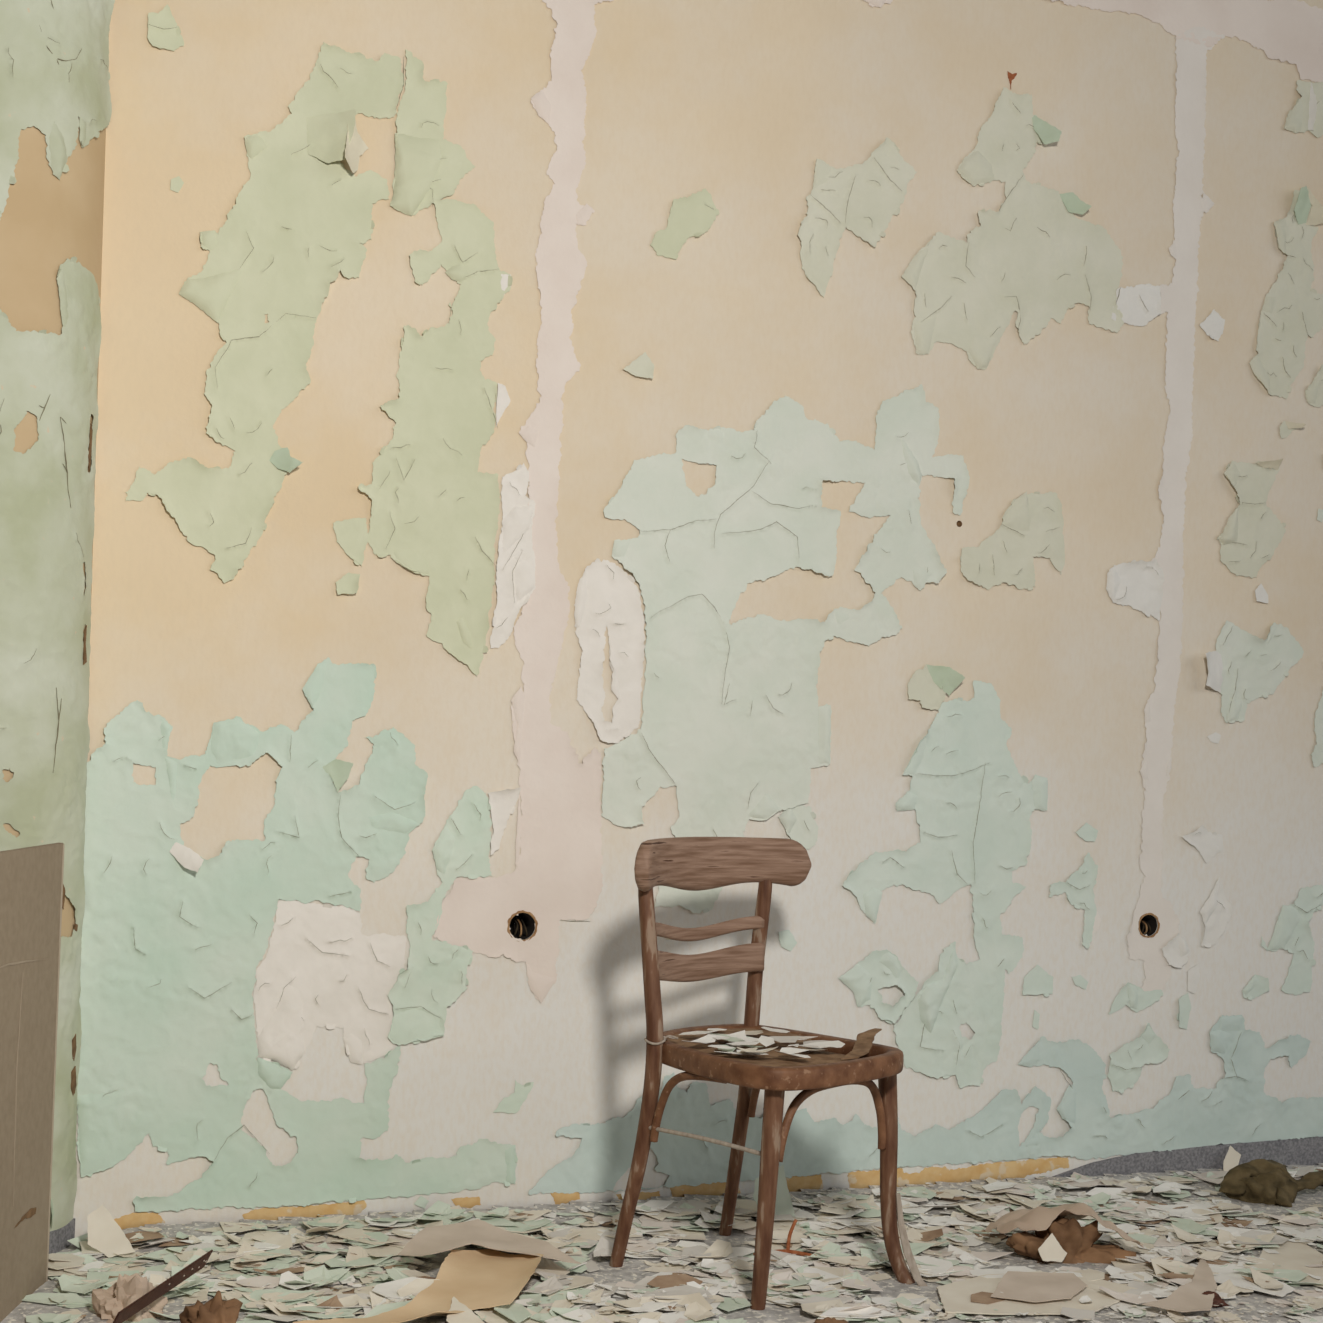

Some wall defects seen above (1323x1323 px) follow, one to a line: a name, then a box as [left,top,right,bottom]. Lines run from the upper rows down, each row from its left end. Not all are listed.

peeling [0,0,115,217]
peeling [650,189,719,259]
peeling [901,87,1162,370]
peeling [126,42,536,676]
peeling [0,257,521,1258]
peeling [574,384,970,850]
peeling [1205,620,1304,744]
peeling [654,886,723,913]
peeling [838,664,1048,1088]
peeling [528,1073,763,1204]
peeling [775,1108,880,1222]
peeling [897,1010,1323,1196]